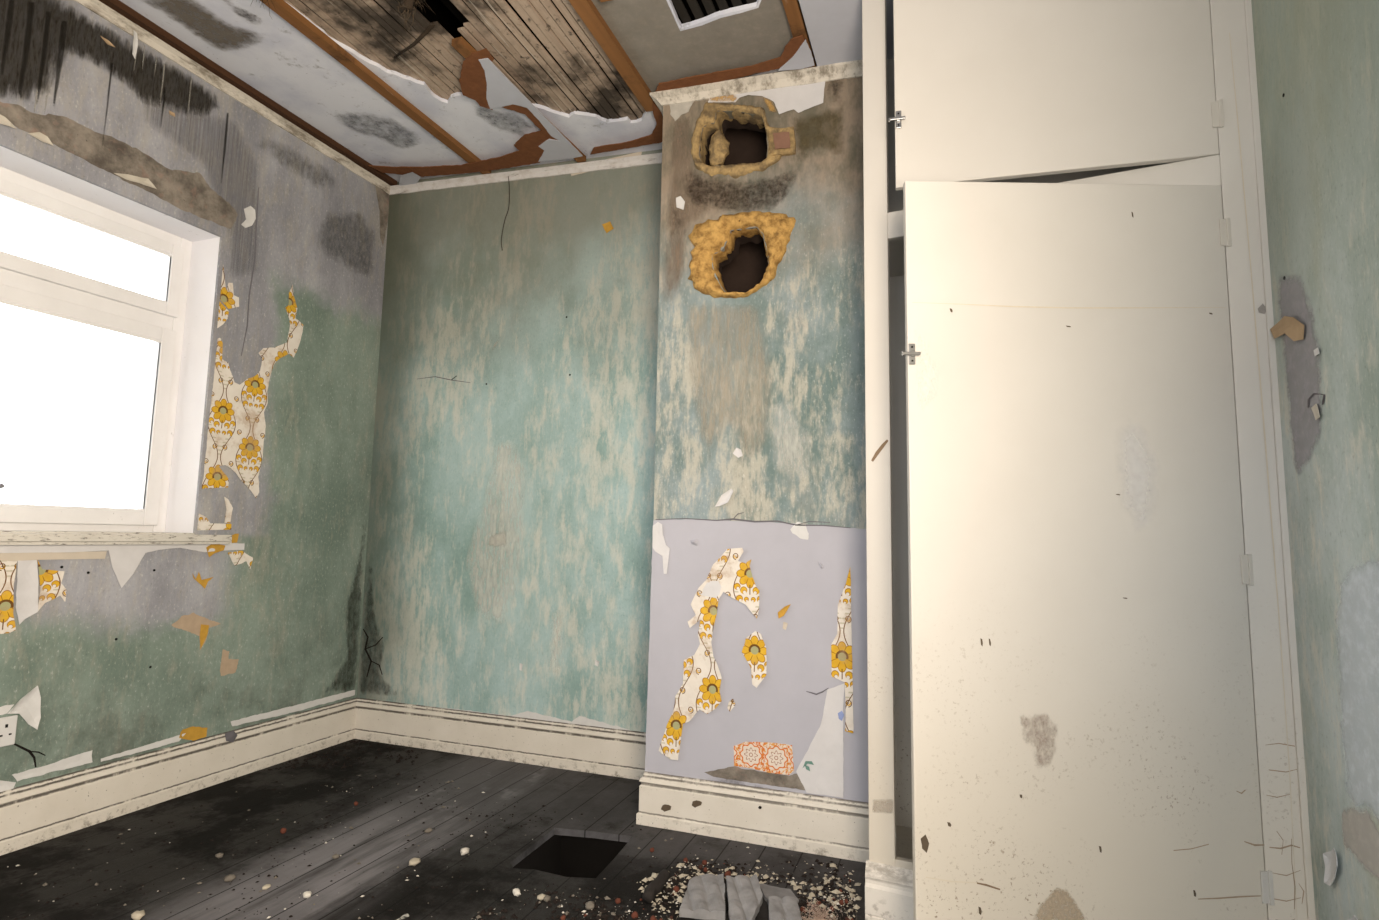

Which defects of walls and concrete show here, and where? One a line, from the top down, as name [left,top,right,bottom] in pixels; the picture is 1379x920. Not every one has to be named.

damp [0,0,255,267]
flaking render [0,102,256,229]
damp [341,115,413,146]
damp [669,124,791,288]
spalling [670,101,796,179]
damp [797,113,841,151]
spalling [688,211,796,298]
damp [334,566,386,693]
crack [363,629,383,677]
flaking render [429,489,869,803]
crack [13,743,45,767]
peeling [0,733,186,792]